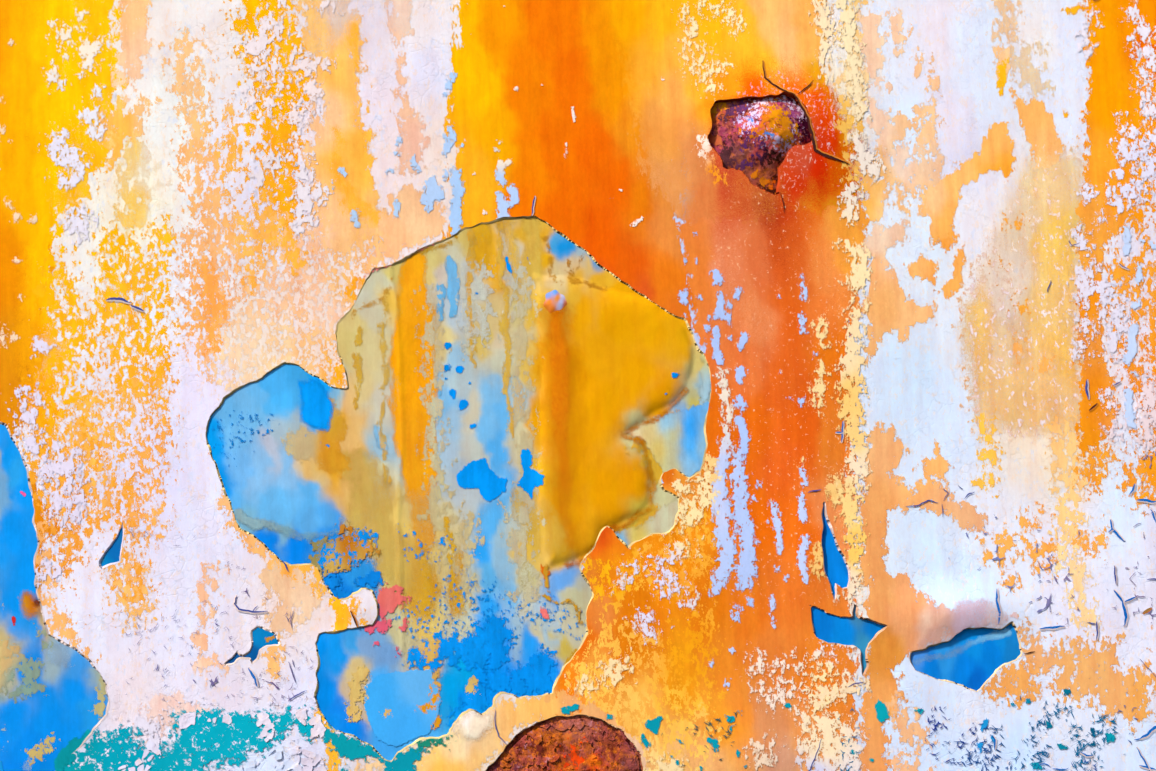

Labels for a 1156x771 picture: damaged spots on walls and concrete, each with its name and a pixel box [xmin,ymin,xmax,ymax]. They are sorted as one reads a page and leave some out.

rust [0,0,453,685]
peeling [0,0,892,771]
rust [413,0,1156,771]
rust [132,559,232,743]
rust [313,706,408,771]
peeling [910,621,1023,692]
peeling [976,718,994,753]
peeling [1090,727,1116,747]